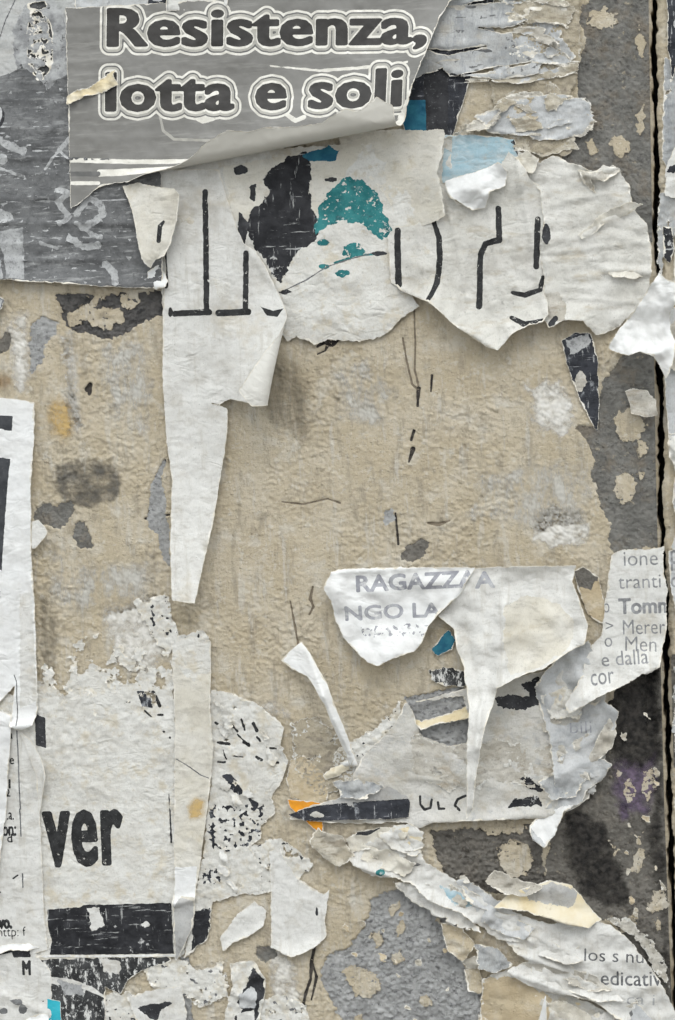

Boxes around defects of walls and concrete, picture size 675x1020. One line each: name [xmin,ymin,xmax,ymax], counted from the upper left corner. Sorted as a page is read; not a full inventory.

spalling [487,0,652,243]
spalling [28,290,163,374]
leakage [57,464,120,506]
spalling [147,460,171,566]
spalling [404,687,469,746]
spalling [430,654,675,1004]
spalling [320,889,488,1020]